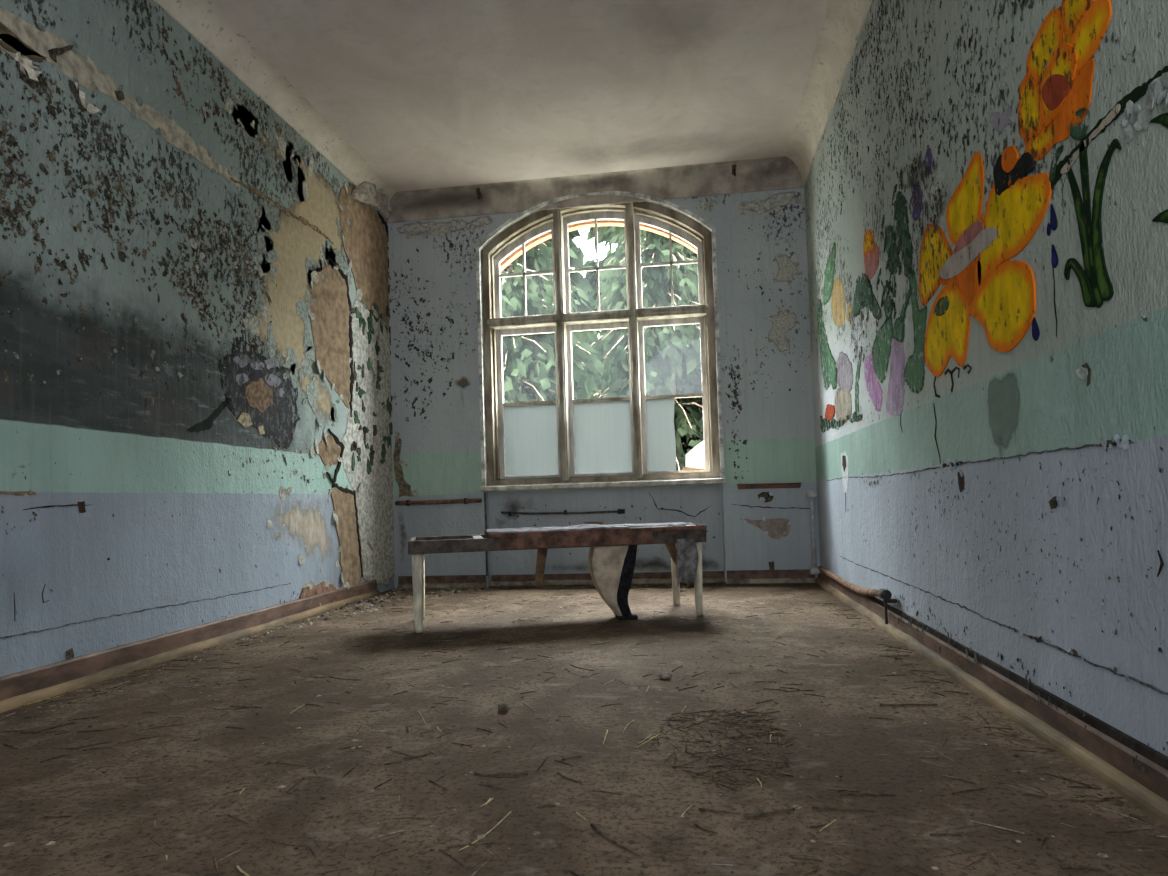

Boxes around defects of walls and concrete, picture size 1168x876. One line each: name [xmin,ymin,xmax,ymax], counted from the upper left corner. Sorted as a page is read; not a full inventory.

peeling [814,0,1034,238]
peeling [0,0,478,625]
crack [0,583,291,639]